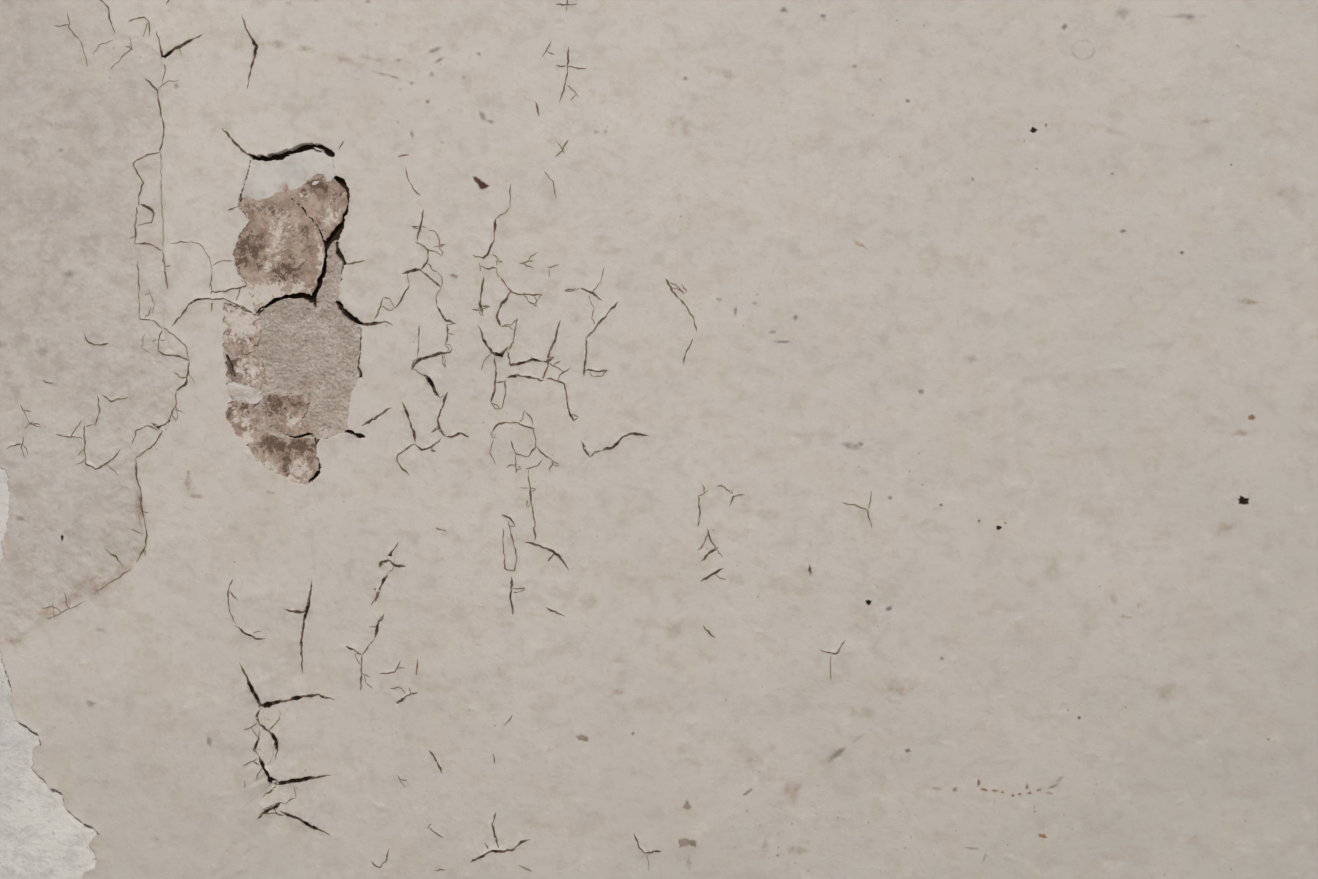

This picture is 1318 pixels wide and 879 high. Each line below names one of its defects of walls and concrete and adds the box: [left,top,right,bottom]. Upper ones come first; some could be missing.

crack [54,0,249,361]
crack [544,140,568,197]
crack [535,42,586,116]
crack [556,0,576,12]
peeling [0,468,10,562]
crack [7,394,128,475]
peeling [99,362,195,590]
spalling [222,128,392,485]
crack [374,154,648,616]
peeling [0,653,100,879]
crack [227,543,418,835]